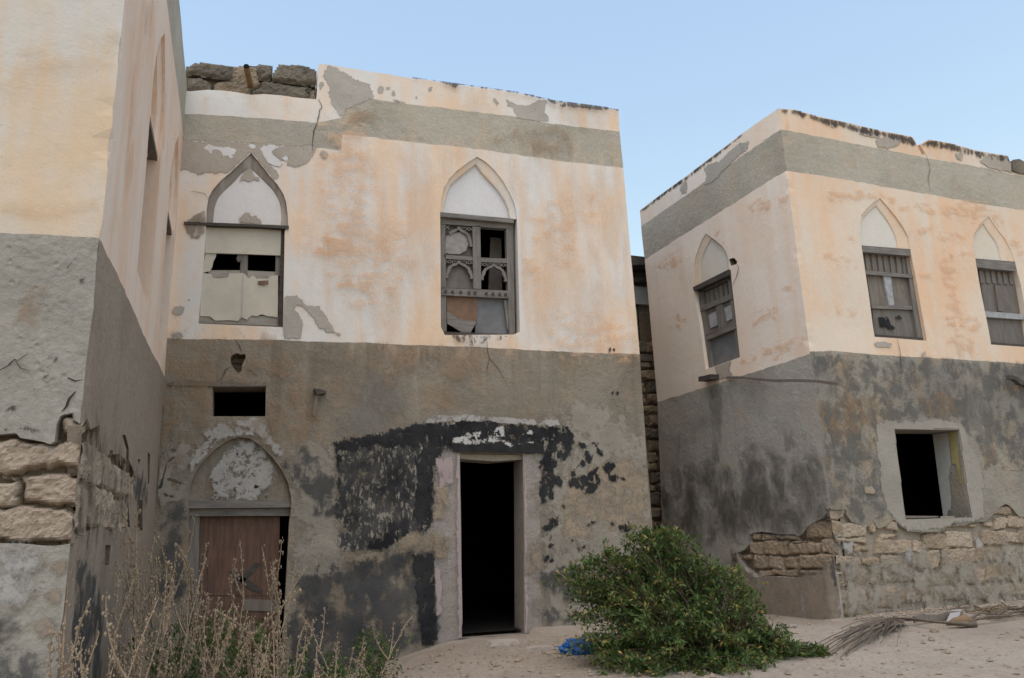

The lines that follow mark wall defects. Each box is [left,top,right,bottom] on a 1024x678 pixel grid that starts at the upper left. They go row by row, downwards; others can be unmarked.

peeling [323,65,432,117]
peeling [493,98,549,122]
peeling [180,139,328,182]
peeling [704,141,749,185]
peeling [283,295,341,339]
spalling [219,341,256,381]
crack [62,378,83,411]
water stain [816,355,1024,521]
peeling [0,391,651,646]
spalling [741,505,1024,618]